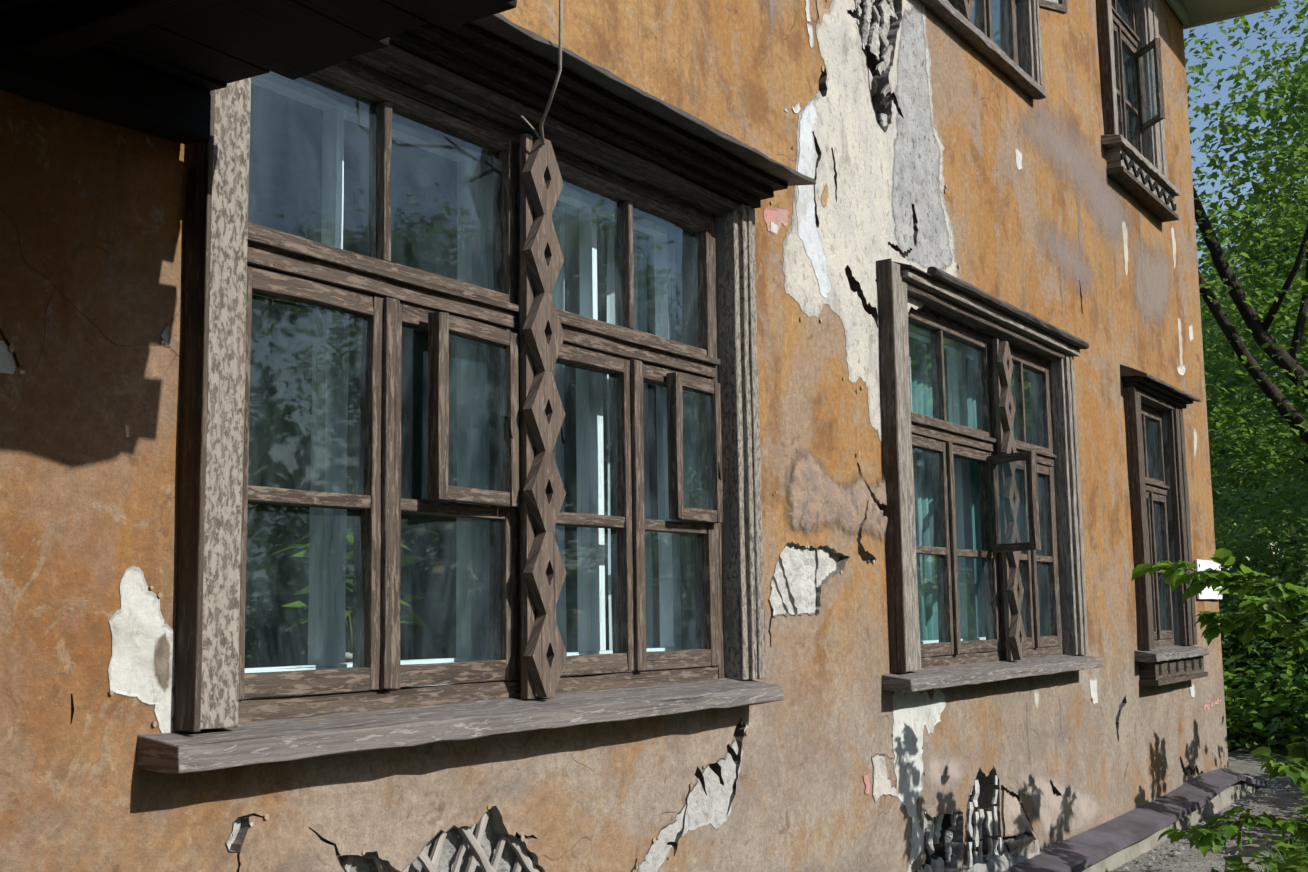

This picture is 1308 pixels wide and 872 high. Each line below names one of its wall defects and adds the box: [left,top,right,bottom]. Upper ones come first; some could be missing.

peeling [764,0,960,442]
crack [845,265,878,328]
peeling [0,340,25,374]
crack [857,462,884,541]
spalling [768,538,876,617]
peeling [108,566,175,733]
peeling [636,720,749,872]
peeling [863,689,1101,872]
crack [230,813,264,872]
spalling [337,804,545,872]